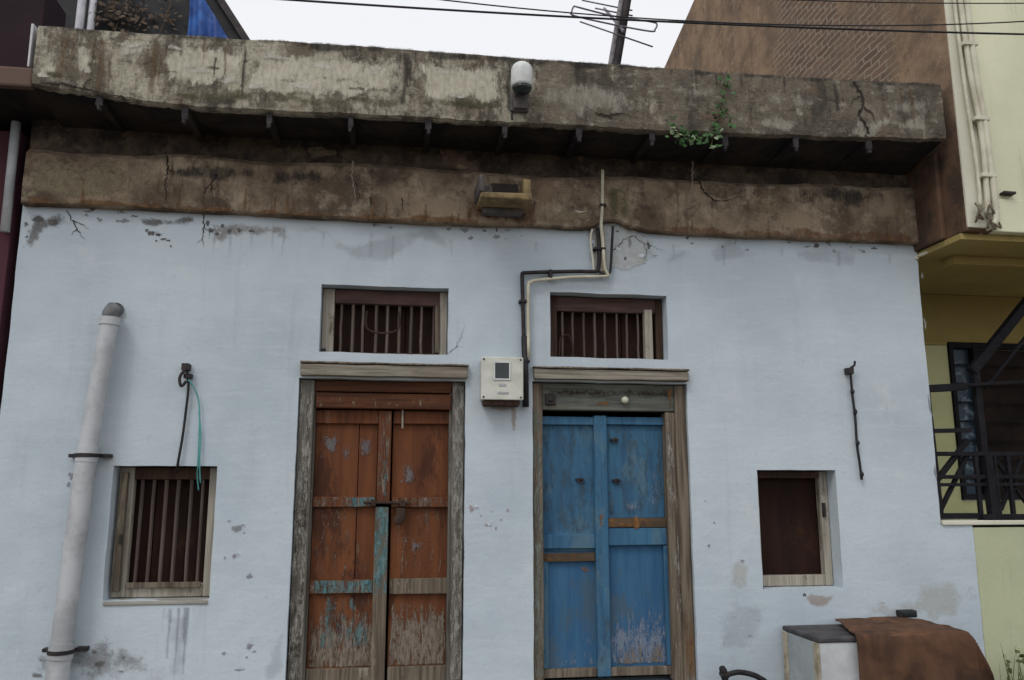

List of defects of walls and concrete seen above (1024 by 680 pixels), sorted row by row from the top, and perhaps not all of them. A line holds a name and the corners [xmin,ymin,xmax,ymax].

damp [301,42,355,51]
crack [851,81,876,134]
crack [164,155,174,201]
crack [196,171,223,246]
crack [688,161,738,208]
spalling [587,224,656,273]